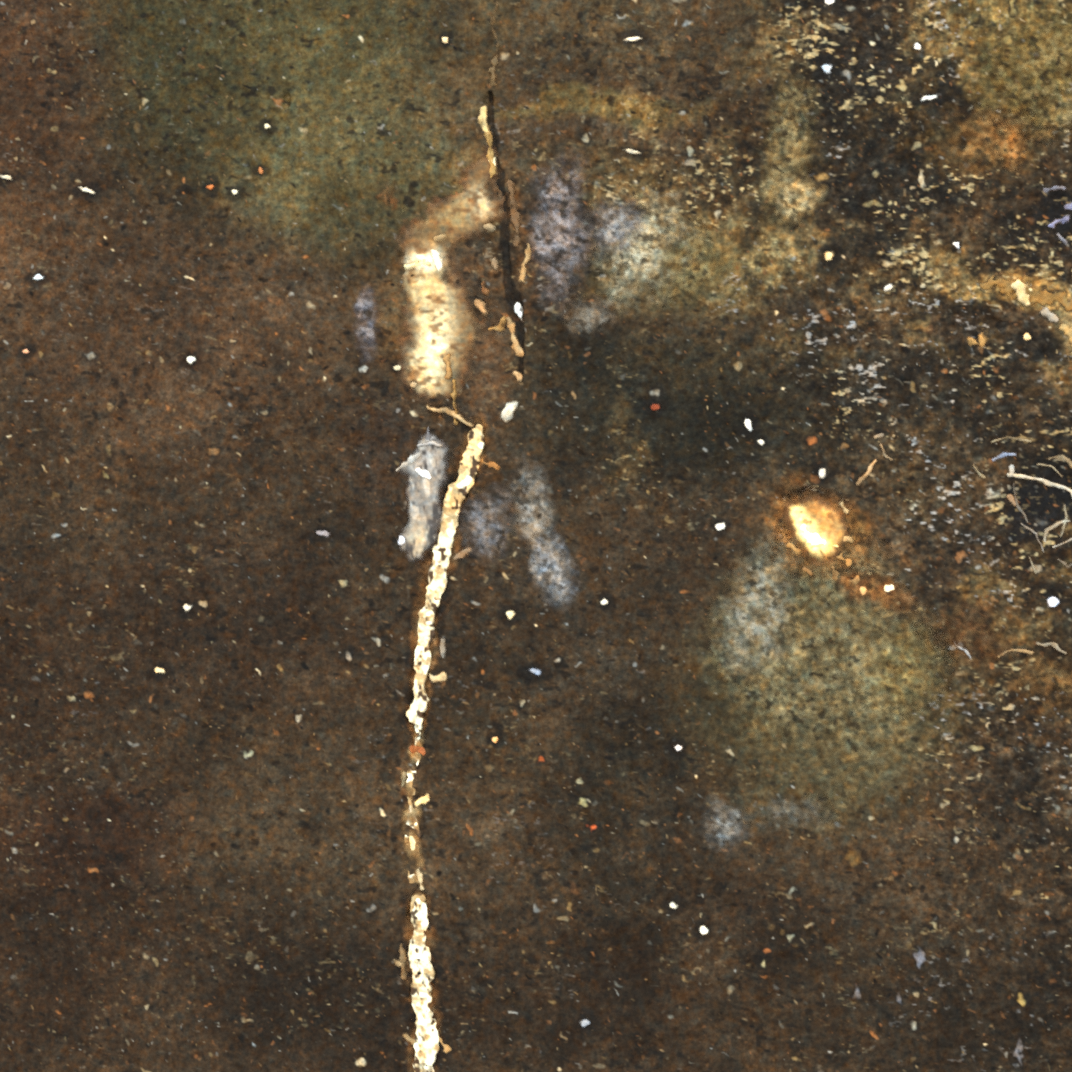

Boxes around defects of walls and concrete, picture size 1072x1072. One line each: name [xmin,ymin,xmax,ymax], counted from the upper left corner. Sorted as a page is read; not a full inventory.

crack [395,3,531,1072]
rust [837,516,869,555]
rust [843,575,894,600]
leakage [721,561,914,771]
leakage [713,812,739,844]
leakage [774,799,817,821]